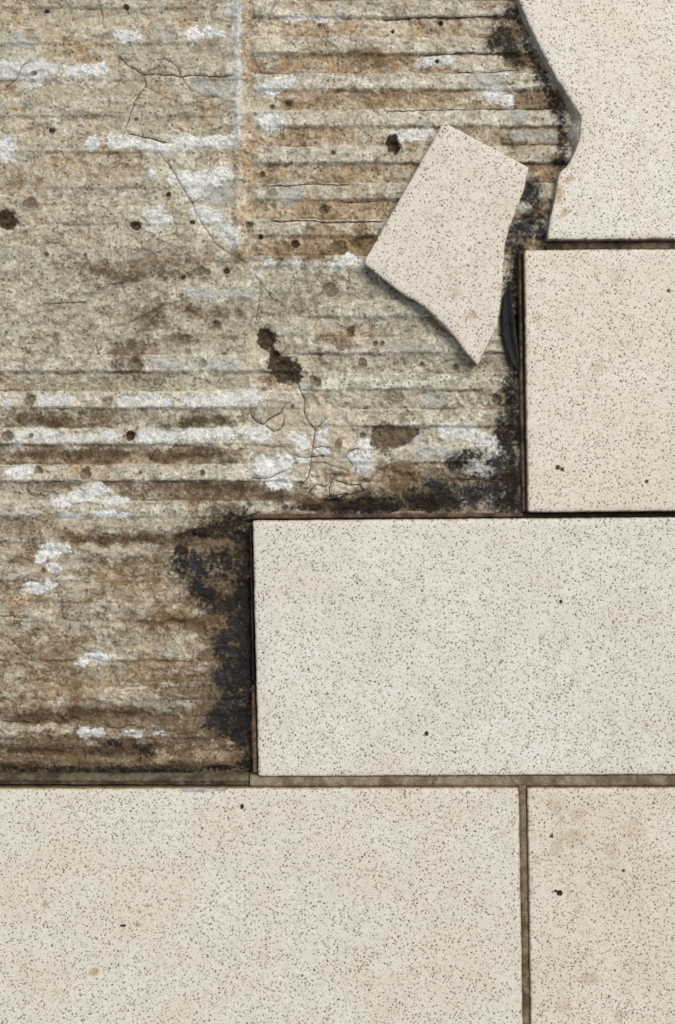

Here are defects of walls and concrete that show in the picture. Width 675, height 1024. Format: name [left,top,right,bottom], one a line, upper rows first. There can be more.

hole [0,197,37,230]
crack [118,57,275,319]
hole [323,283,339,297]
hole [385,134,401,155]
efflorescence [388,125,437,143]
water stain [415,4,569,168]
water stain [503,179,547,344]
spalling [256,328,321,386]
water stain [0,328,520,514]
crack [250,383,363,498]
spalling [370,424,420,452]
water stain [1,481,259,773]